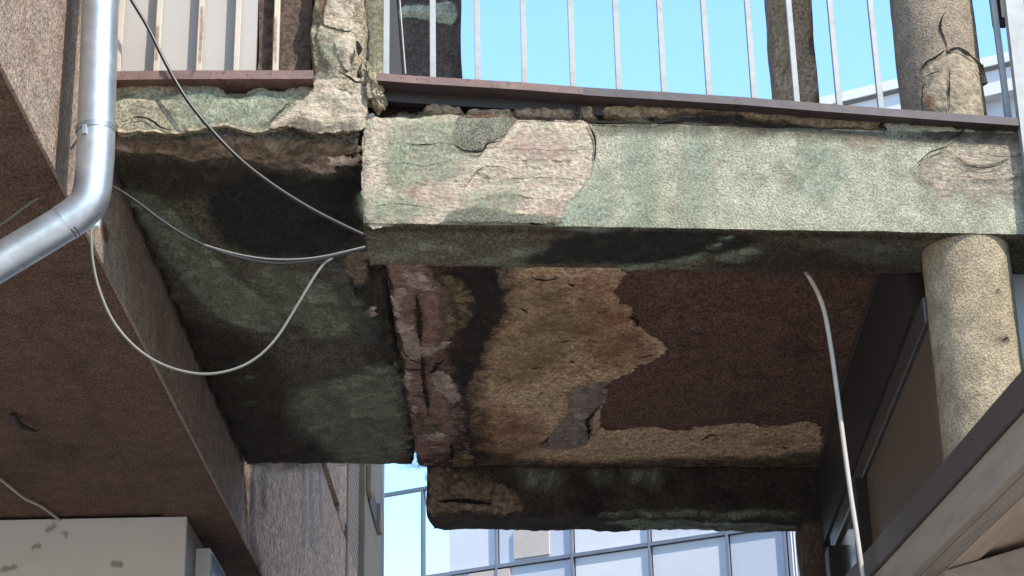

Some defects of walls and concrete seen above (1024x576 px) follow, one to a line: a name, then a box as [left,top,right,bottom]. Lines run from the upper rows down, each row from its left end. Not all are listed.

peeling [115,0,1024,229]
crack [911,12,1019,169]
water stain [121,161,922,513]
peeling [386,265,824,517]